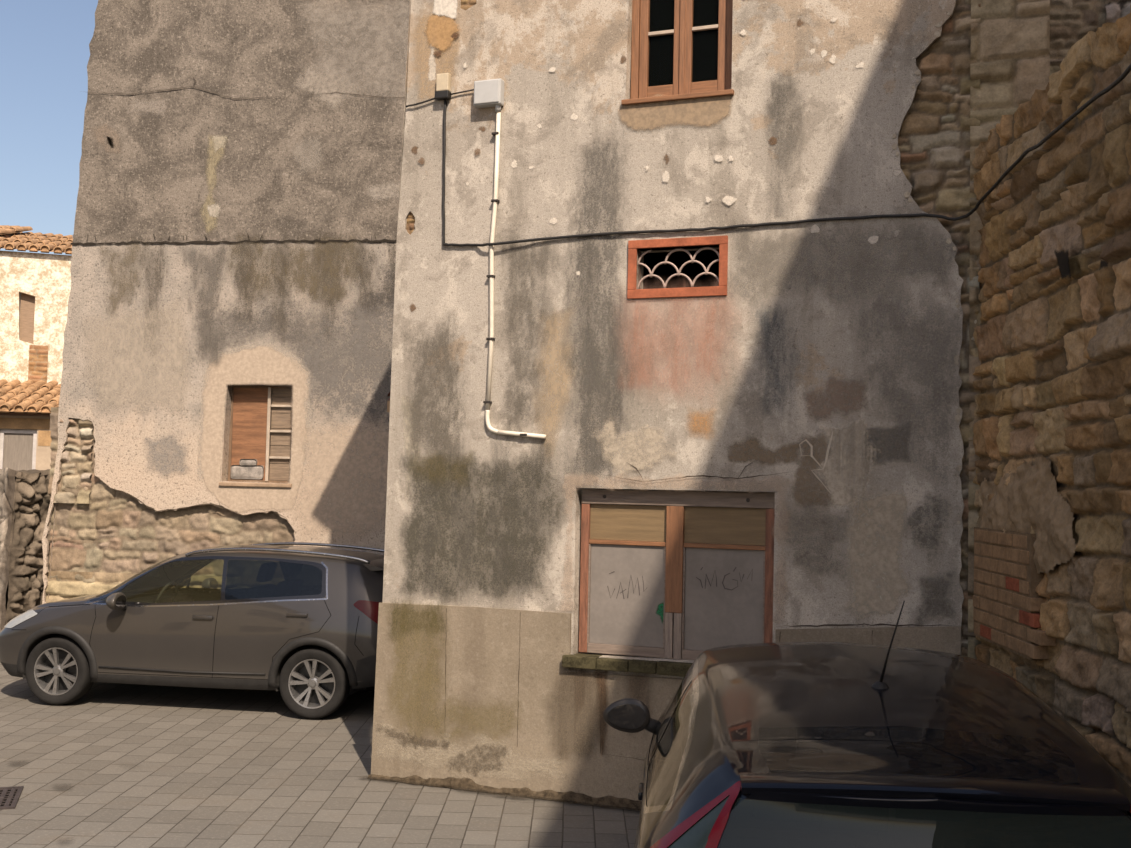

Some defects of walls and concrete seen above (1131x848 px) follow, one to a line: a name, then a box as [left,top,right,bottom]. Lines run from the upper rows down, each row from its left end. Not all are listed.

flaking render [426,0,477,81]
peeling [706,196,737,205]
damp [109,246,161,329]
flaking render [891,0,981,657]
damp [188,239,561,596]
flaking render [46,407,295,603]
damp [376,669,598,779]